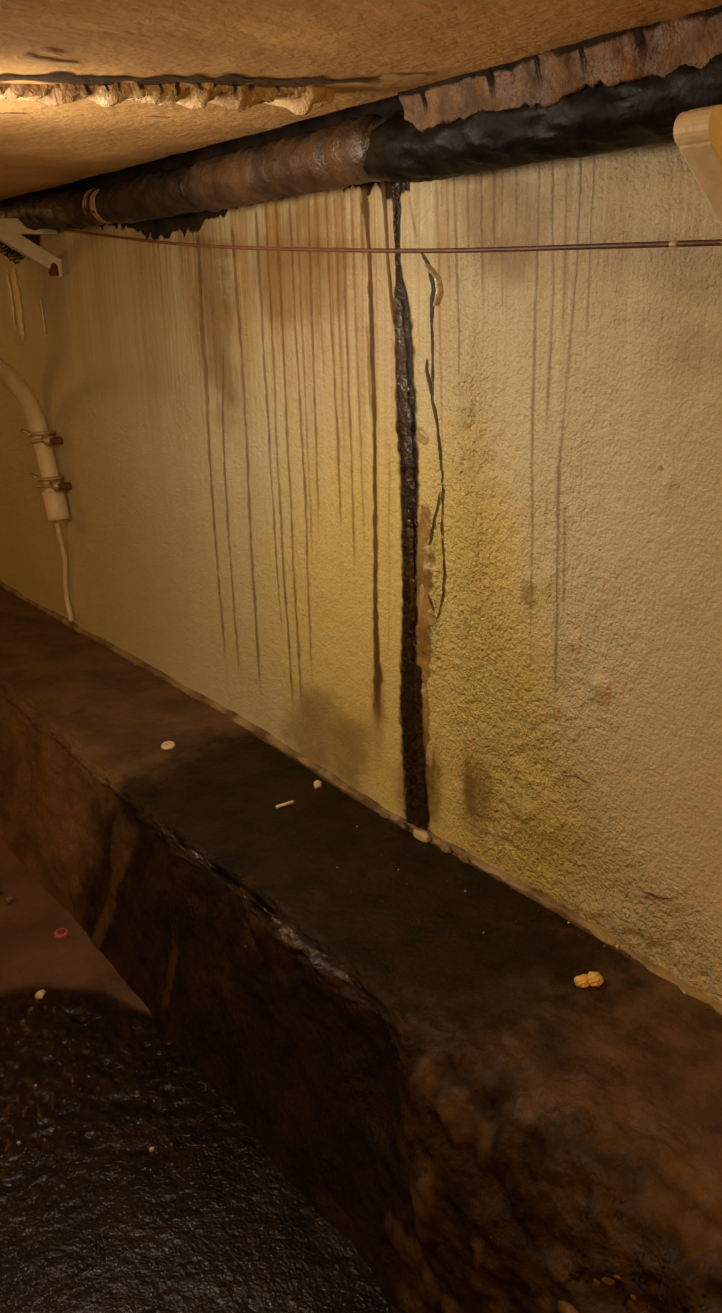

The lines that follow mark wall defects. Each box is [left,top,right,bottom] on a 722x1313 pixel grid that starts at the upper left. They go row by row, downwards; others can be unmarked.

spalling [0,83,336,119]
water stain [1,95,404,201]
spalling [398,5,722,132]
crack [411,213,445,631]